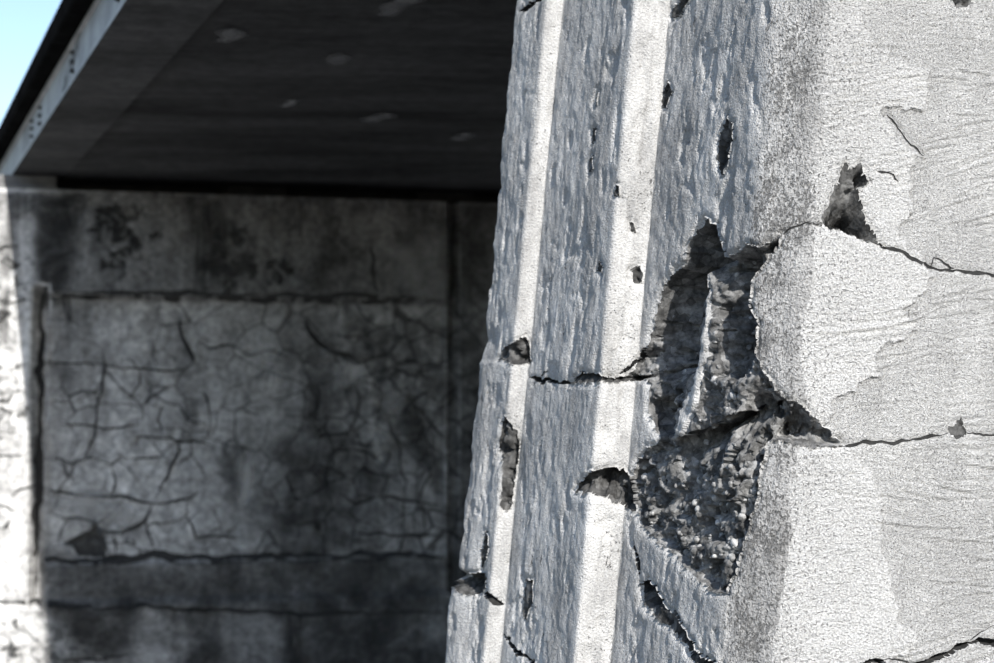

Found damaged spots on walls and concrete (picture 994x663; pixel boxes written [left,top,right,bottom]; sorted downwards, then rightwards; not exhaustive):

leakage [35,193,82,306]
leakage [89,202,162,280]
leakage [188,196,293,293]
crack [874,242,994,277]
crack [529,370,571,386]
crack [619,347,657,381]
peeling [571,0,934,663]
crack [0,318,291,554]
spalling [499,416,521,512]
leakage [186,637,222,663]
leakage [285,596,438,663]
crack [863,625,994,663]